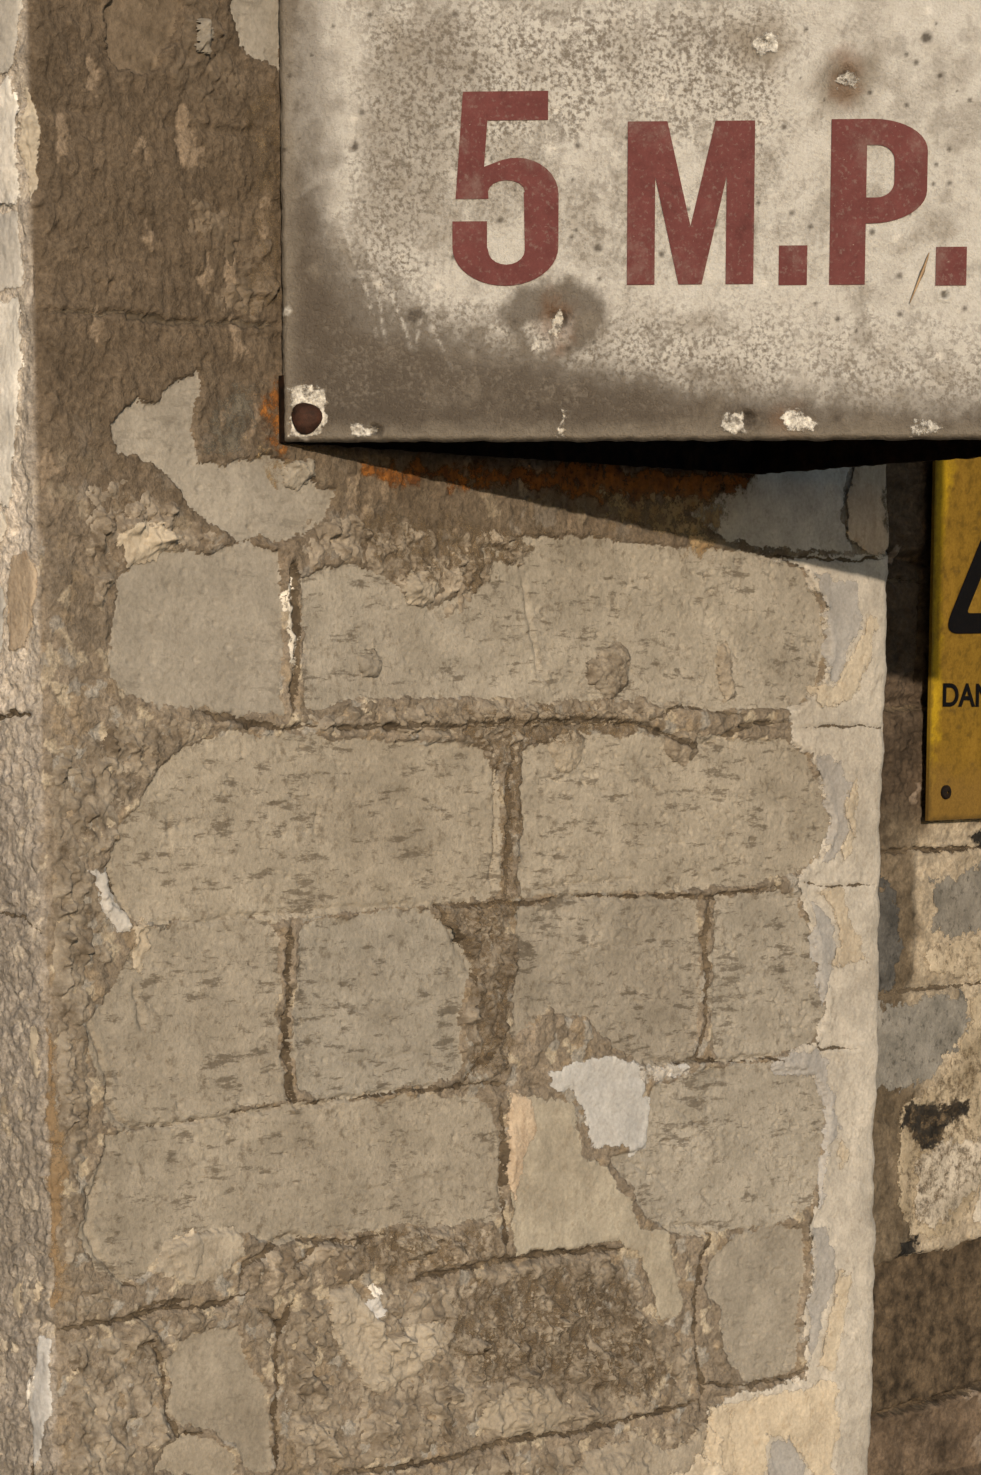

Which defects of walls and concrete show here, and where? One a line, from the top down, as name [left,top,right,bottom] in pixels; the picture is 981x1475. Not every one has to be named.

flaking render [188,198,281,320]
corrosion [252,382,289,490]
crack [762,554,923,586]
crack [199,559,981,1065]
spalling [26,370,981,1475]
peeling [0,1339,19,1353]
peeling [12,1280,44,1318]
crack [57,1232,386,1471]